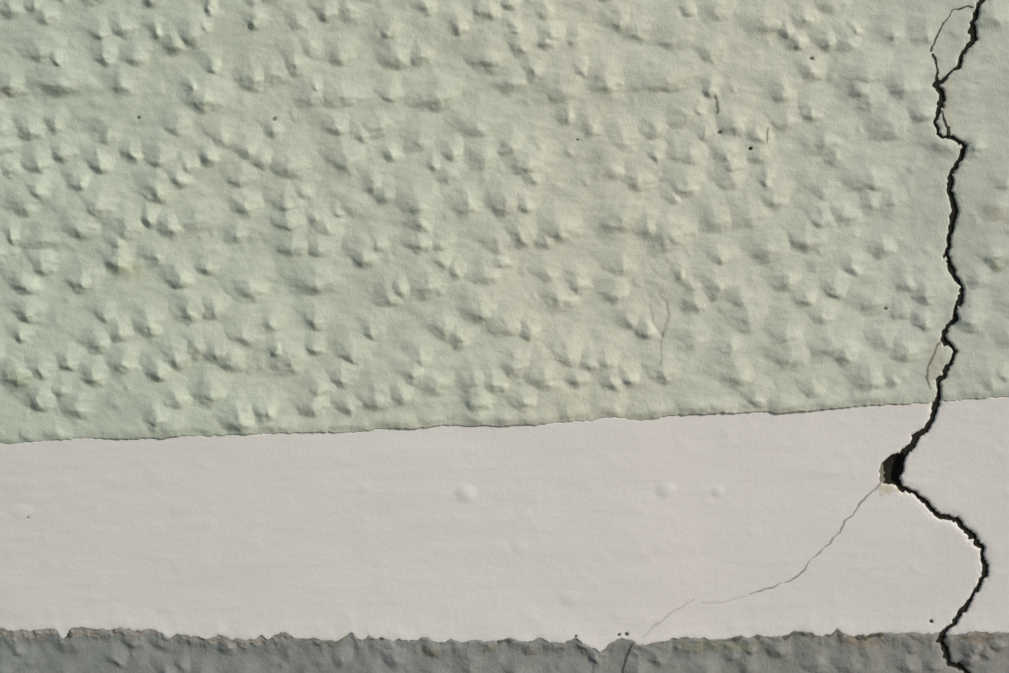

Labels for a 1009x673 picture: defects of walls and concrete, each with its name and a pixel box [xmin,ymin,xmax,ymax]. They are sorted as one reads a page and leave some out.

crack [622,0,988,673]